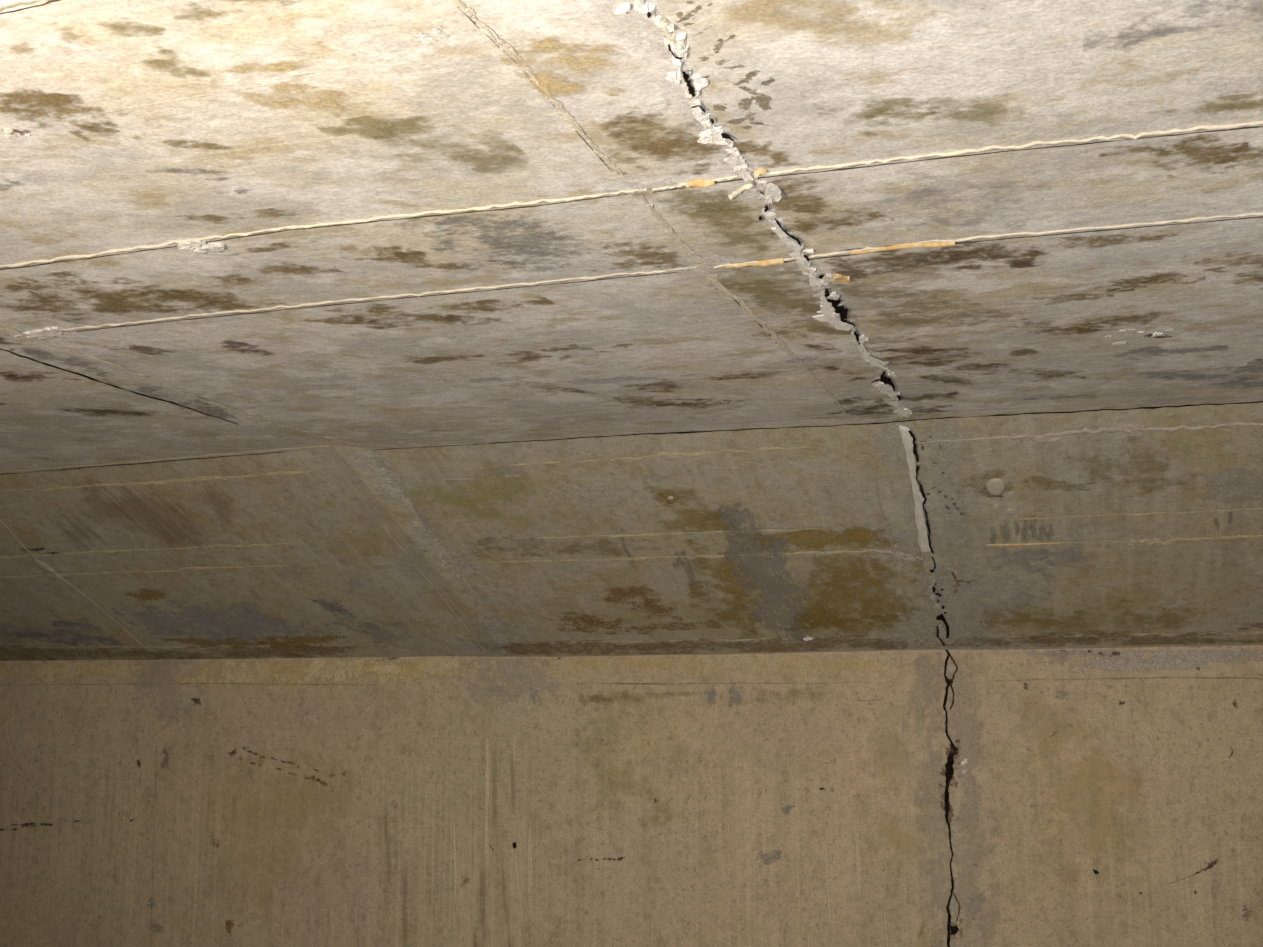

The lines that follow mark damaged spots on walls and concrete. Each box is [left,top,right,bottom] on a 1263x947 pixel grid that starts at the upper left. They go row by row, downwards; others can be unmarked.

leakage [0,91,118,141]
leakage [236,62,422,138]
leakage [499,39,611,97]
leakage [584,0,852,251]
leakage [1099,135,1263,169]
leakage [360,217,573,271]
leakage [6,272,255,320]
leakage [306,300,502,329]
leakage [708,240,1043,415]
crack [376,0,1263,947]
leakage [481,504,927,680]
leakage [0,580,483,688]